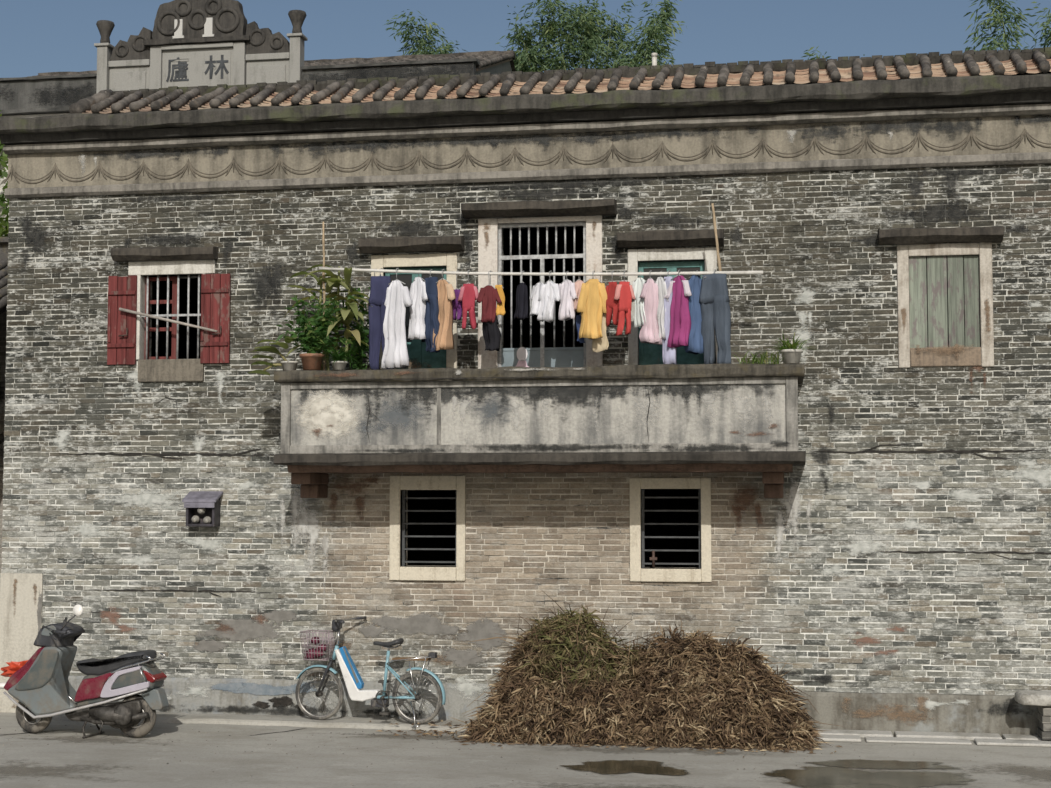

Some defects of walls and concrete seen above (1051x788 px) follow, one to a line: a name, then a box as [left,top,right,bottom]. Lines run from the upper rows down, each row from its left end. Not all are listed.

damp [1015,115,1051,124]
damp [787,117,982,143]
damp [304,128,719,155]
damp [81,147,227,166]
damp [299,384,773,433]
crack [59,448,274,459]
damp [475,444,650,452]
damp [667,444,753,452]
crack [814,444,1044,459]